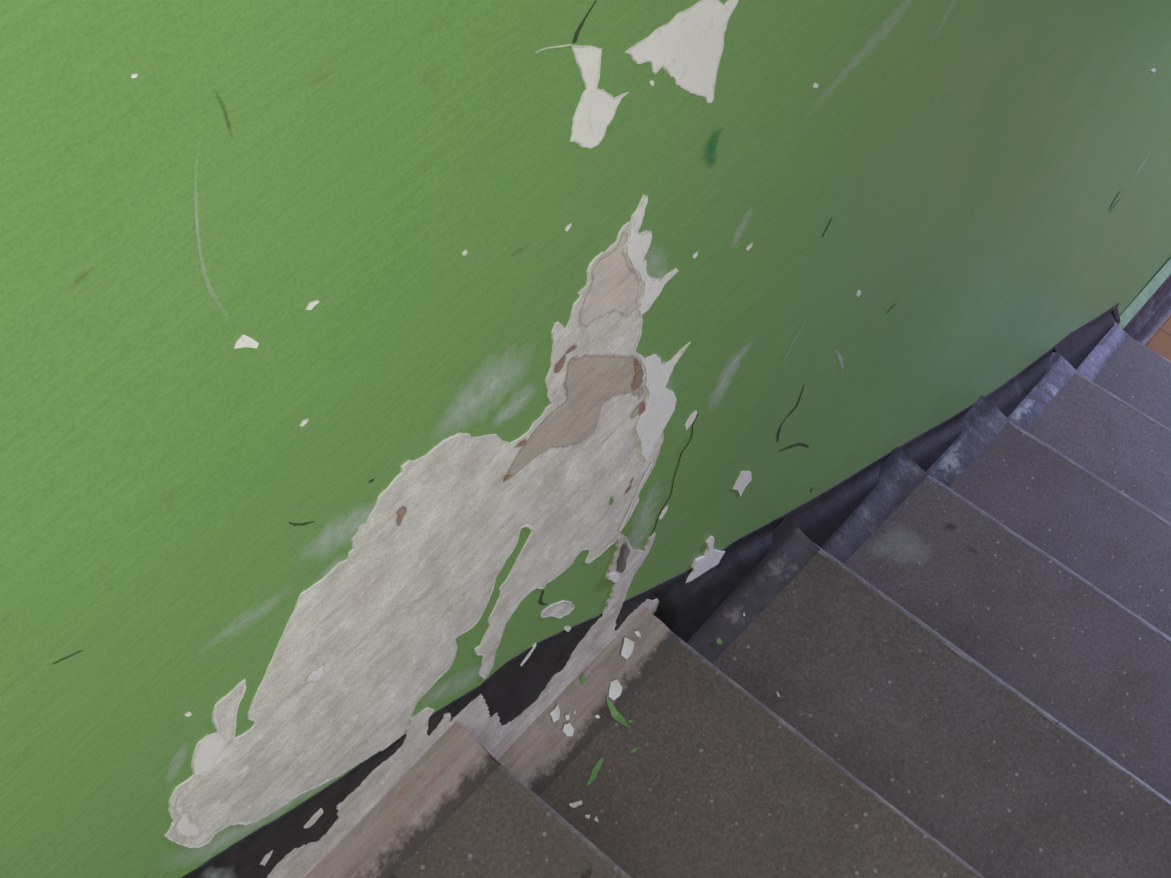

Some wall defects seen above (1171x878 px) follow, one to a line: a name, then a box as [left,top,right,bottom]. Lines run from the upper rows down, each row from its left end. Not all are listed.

peeling [570,45,629,149]
peeling [625,0,739,103]
flaking render [164,194,691,878]
peeling [686,536,725,583]